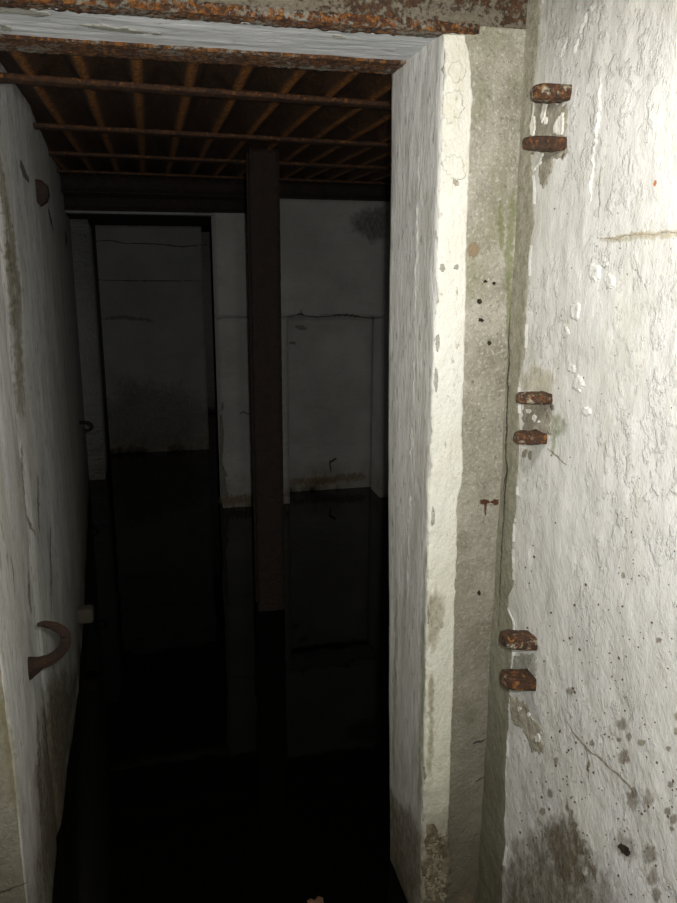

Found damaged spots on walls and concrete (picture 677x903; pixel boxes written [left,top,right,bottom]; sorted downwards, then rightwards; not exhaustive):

crack [498,298,511,627]
leakage [544,805,595,881]